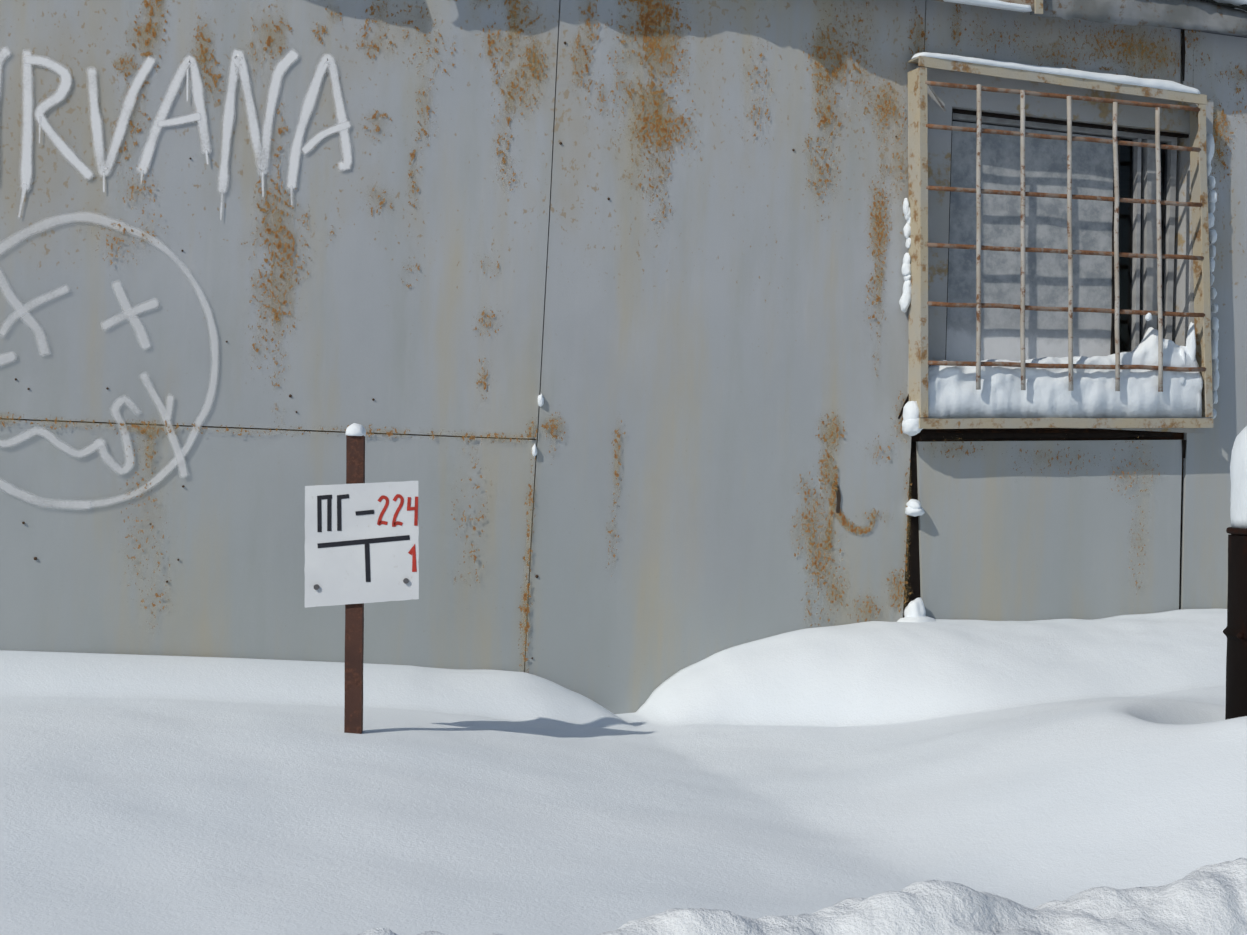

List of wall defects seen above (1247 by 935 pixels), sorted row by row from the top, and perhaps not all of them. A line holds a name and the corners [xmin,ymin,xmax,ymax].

rust [98,0,168,264]
rust [190,16,225,102]
rust [248,5,292,73]
rust [241,103,311,387]
rust [356,0,456,208]
rust [474,0,548,190]
rust [570,0,701,228]
rust [803,2,908,370]
rust [950,4,1246,198]
rust [792,412,912,626]